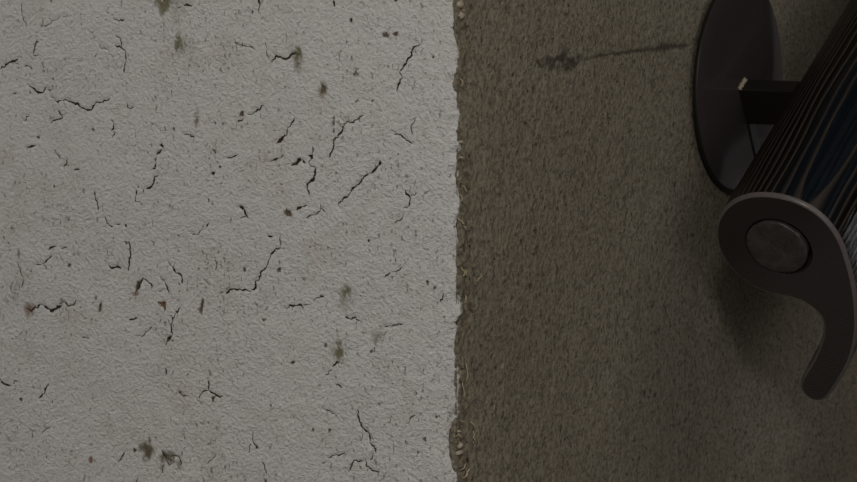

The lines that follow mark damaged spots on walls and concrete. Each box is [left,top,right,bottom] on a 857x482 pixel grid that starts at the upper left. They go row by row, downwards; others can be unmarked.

damp [156,0,169,13]
spalling [452,0,465,41]
crack [1,5,135,137]
spalling [452,67,463,94]
crack [270,115,380,218]
spalling [455,130,467,202]
crack [94,191,183,345]
crack [204,238,285,294]
spalling [456,217,482,304]
spalling [449,320,476,482]
damp [140,438,174,459]
crack [321,408,379,472]